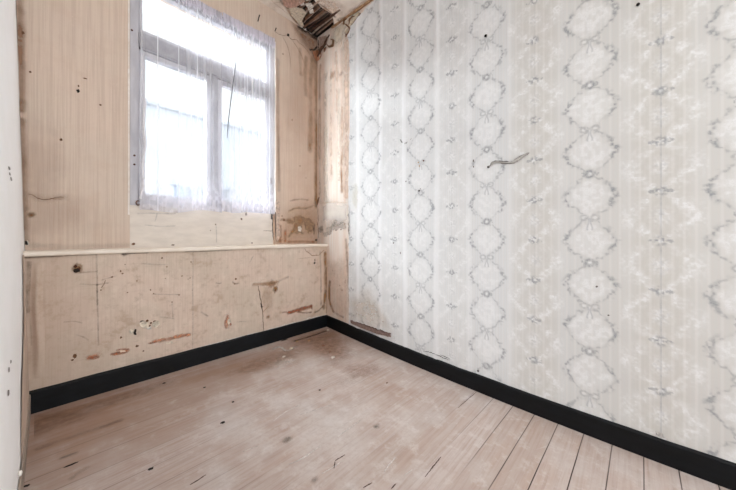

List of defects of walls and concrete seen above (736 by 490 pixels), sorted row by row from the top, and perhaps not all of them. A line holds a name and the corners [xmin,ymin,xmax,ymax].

spalling [297,6,322,61]
damp [333,72,349,198]
crack [201,286,326,347]